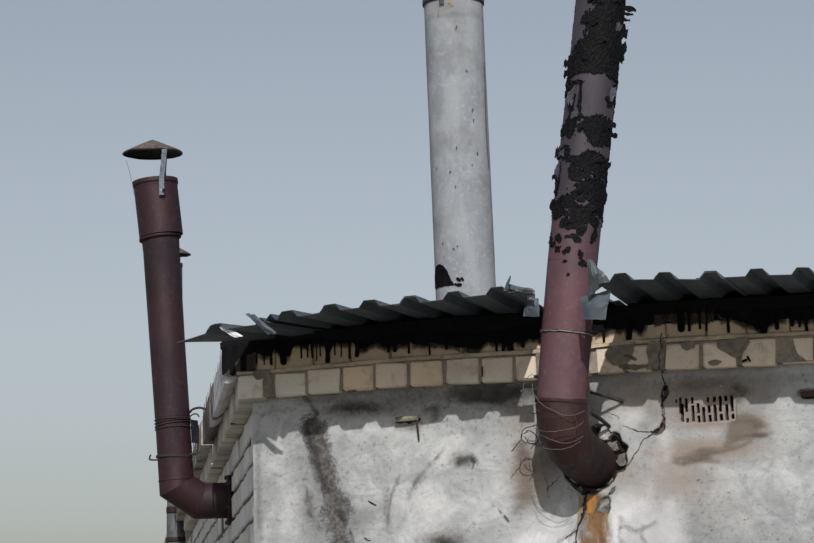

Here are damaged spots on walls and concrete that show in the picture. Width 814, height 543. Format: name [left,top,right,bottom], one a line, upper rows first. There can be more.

crack [626,333,669,467]
crack [566,491,590,543]
corrosion [577,494,608,543]